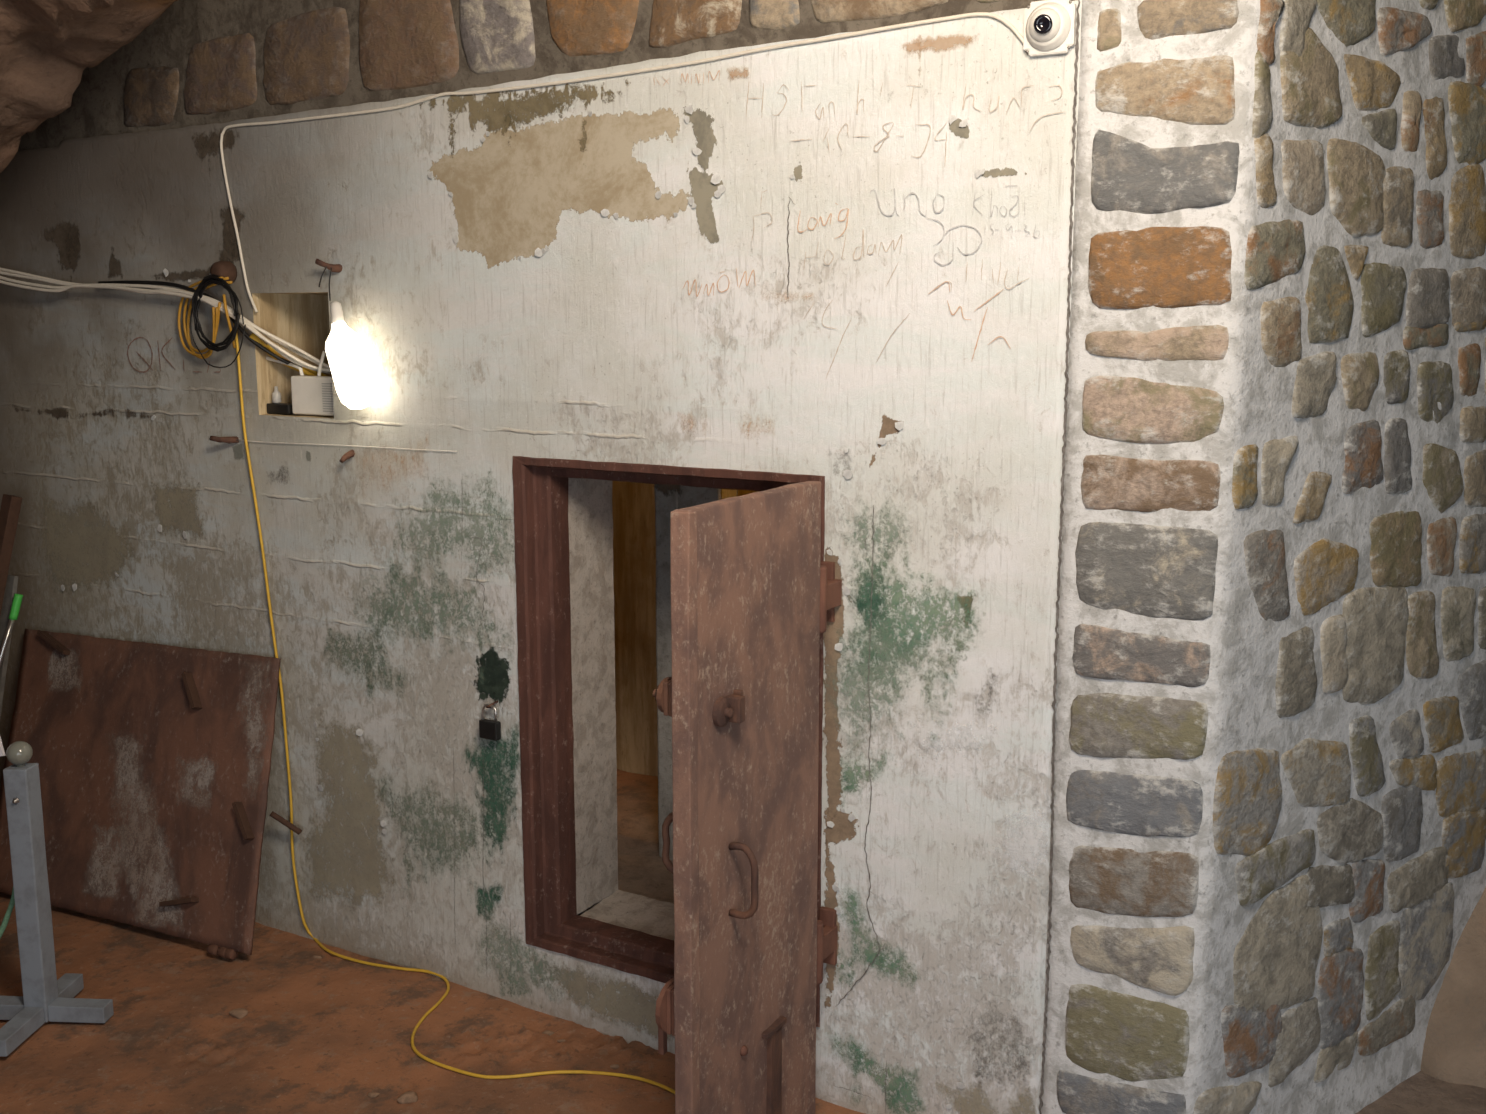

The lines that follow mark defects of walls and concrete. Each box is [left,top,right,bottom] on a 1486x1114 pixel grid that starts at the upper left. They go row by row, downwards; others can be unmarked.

peeling [428,106,726,269]
spalling [869,415,904,467]
water stain [325,613,403,695]
water stain [474,647,511,704]
water stain [957,596,974,626]
water stain [466,730,519,862]
spalling [822,547,859,1008]
crack [835,505,887,1007]